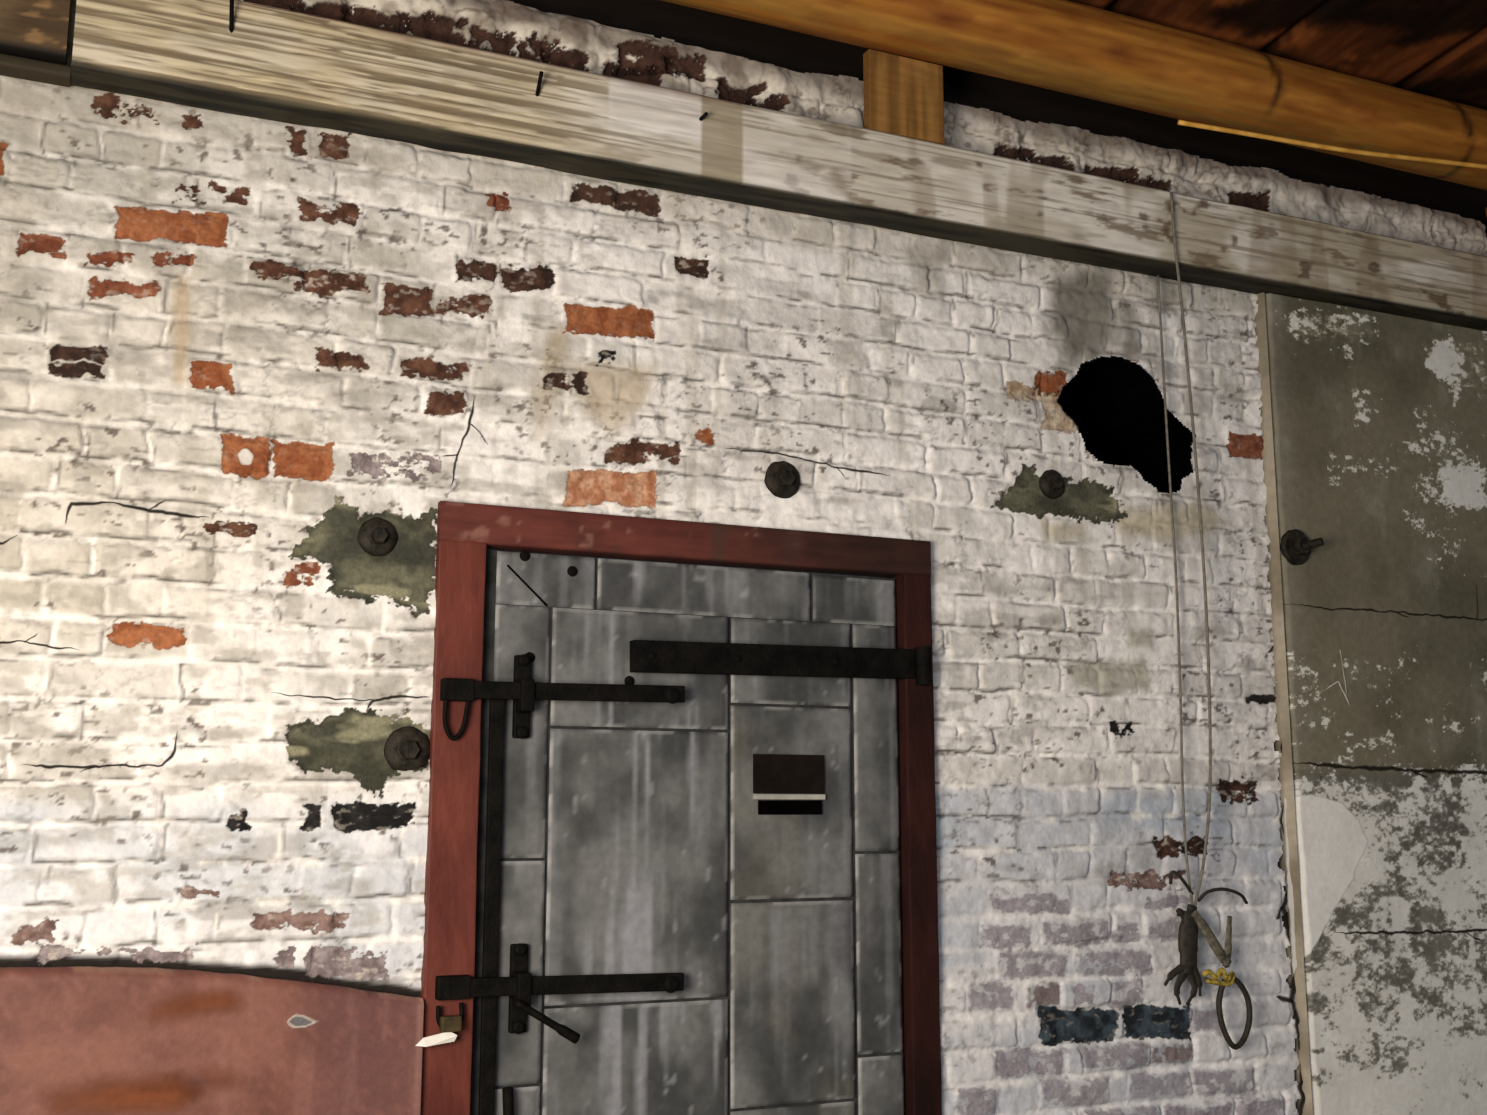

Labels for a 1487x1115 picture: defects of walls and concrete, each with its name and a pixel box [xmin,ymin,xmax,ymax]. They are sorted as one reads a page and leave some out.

spalling [244,0,790,112]
peeling [249,259,555,319]
crack [444,400,488,486]
spalling [1005,356,1196,493]
crack [65,501,210,524]
flaking render [220,433,441,618]
crack [0,634,78,650]
crack [1283,586,1487,621]
crack [24,734,177,772]
flaking render [285,707,430,833]
crack [1280,742,1487,778]
peeling [1246,645,1487,1115]